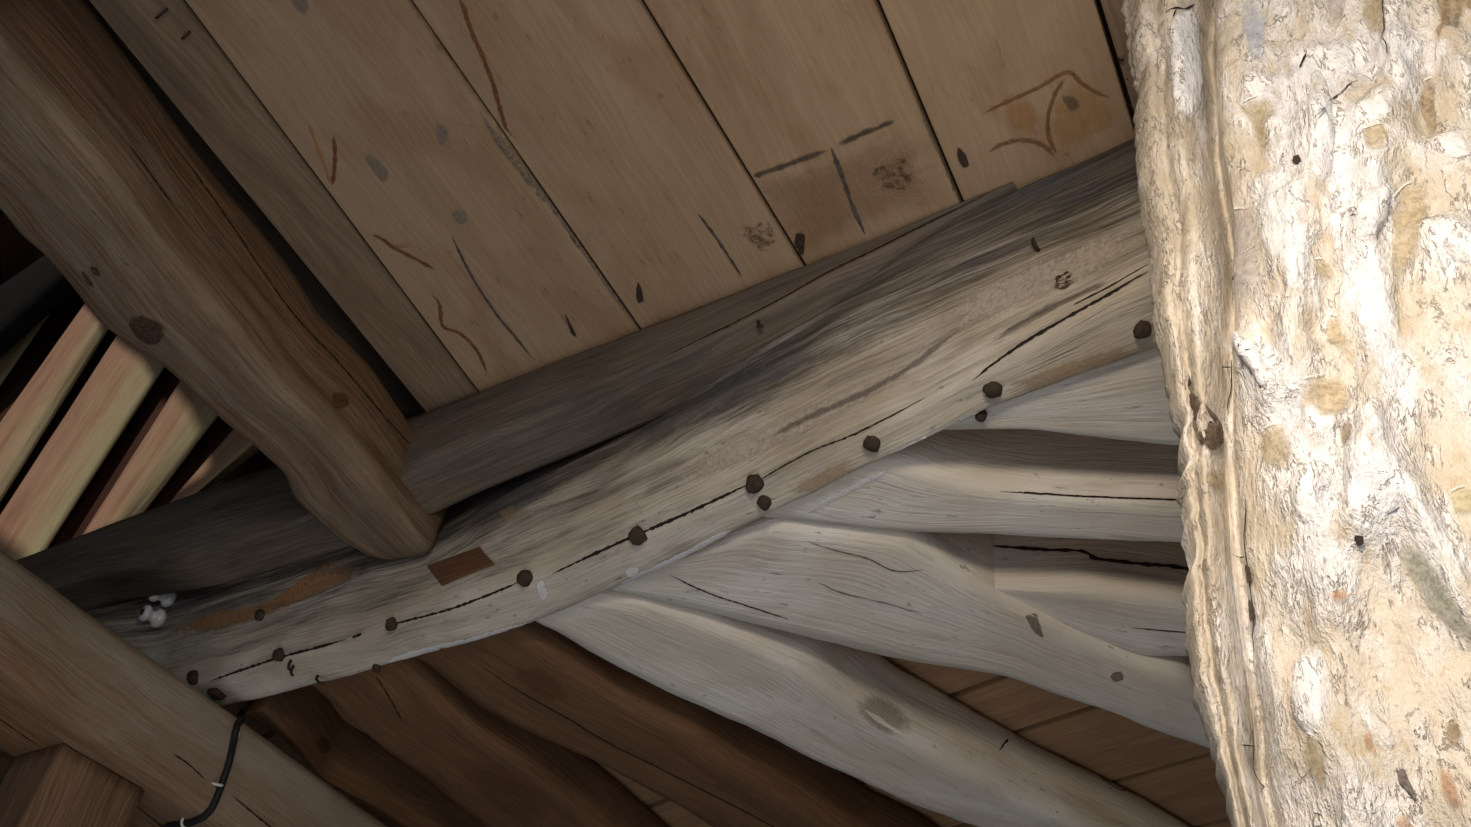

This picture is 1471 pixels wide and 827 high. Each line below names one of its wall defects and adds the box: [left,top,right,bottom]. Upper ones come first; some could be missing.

crack [552,399,922,574]
crack [1003,491,1176,501]
crack [396,583,516,624]
crack [670,575,786,619]
crack [812,543,923,614]
crack [993,545,1189,570]
crack [211,633,361,681]